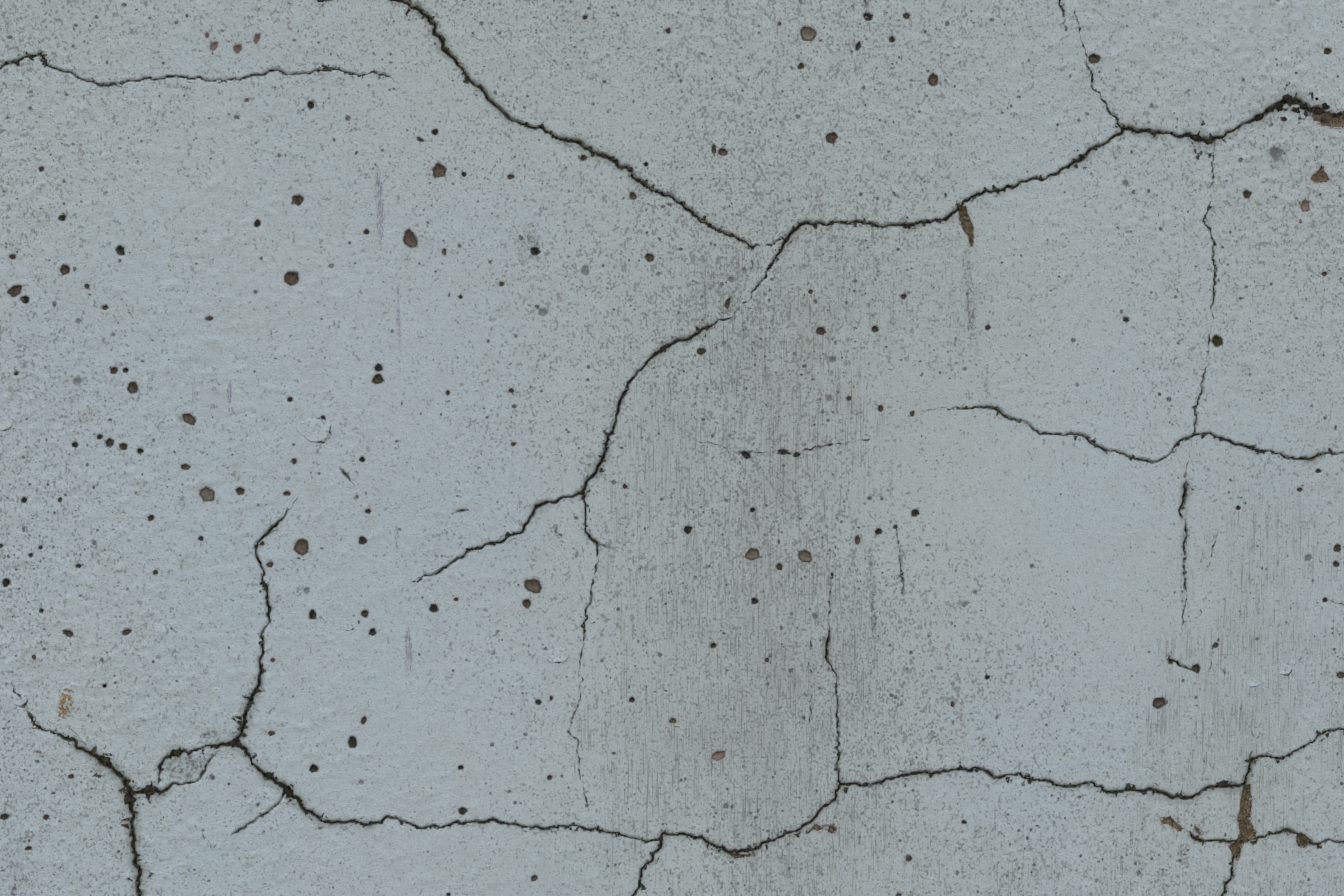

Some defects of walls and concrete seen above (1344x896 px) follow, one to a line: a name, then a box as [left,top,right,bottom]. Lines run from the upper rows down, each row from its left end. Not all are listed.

crack [0,51,399,87]
crack [391,0,1344,810]
crack [12,498,1344,896]